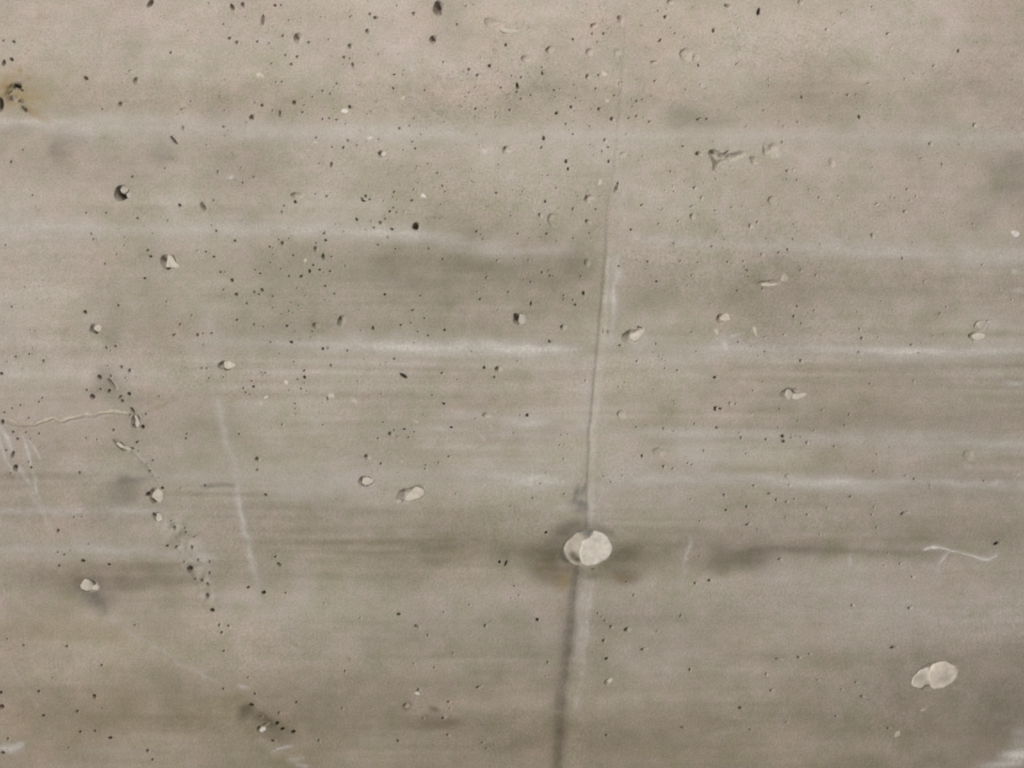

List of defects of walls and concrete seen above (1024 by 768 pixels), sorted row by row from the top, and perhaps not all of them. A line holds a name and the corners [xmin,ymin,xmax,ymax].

corrosion [1,81,46,121]